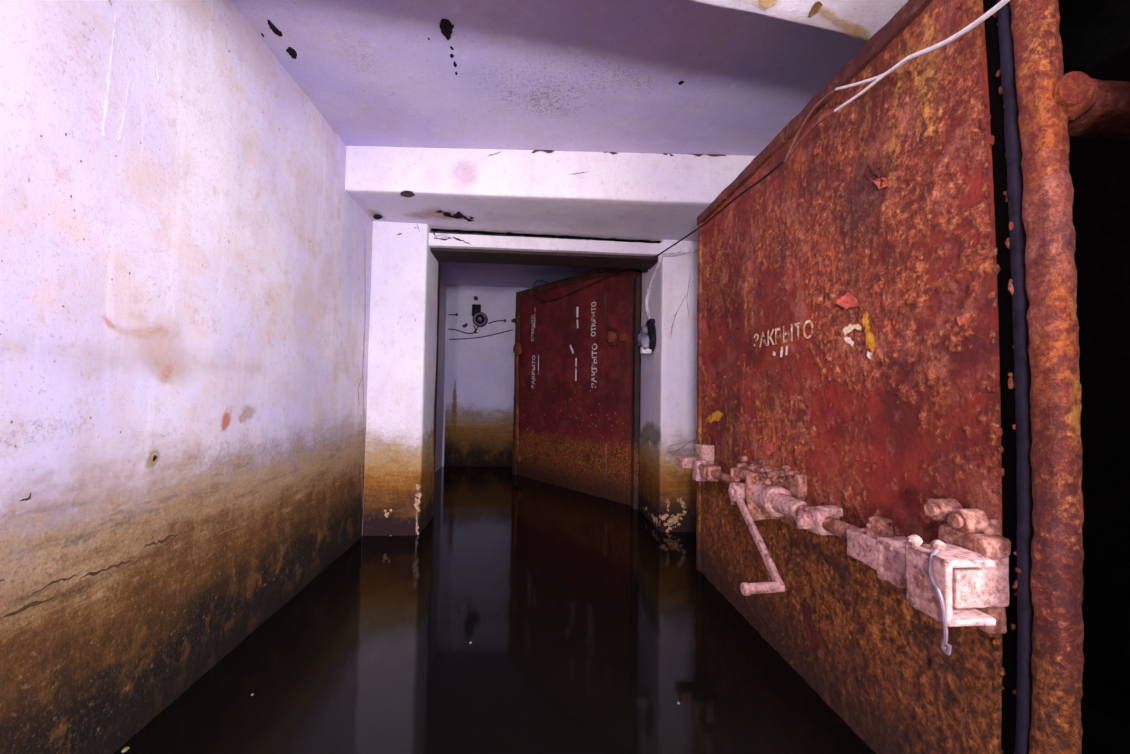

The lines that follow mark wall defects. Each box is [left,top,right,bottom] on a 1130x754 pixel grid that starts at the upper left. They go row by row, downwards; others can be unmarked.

rust [979,69,1004,146]
rust [983,191,1014,307]
rust [862,311,875,352]
rust [707,410,723,424]
rust [987,373,1015,393]
water stain [639,424,697,532]
rust [991,424,1016,495]
water stain [0,410,514,754]
rust [990,659,1016,695]